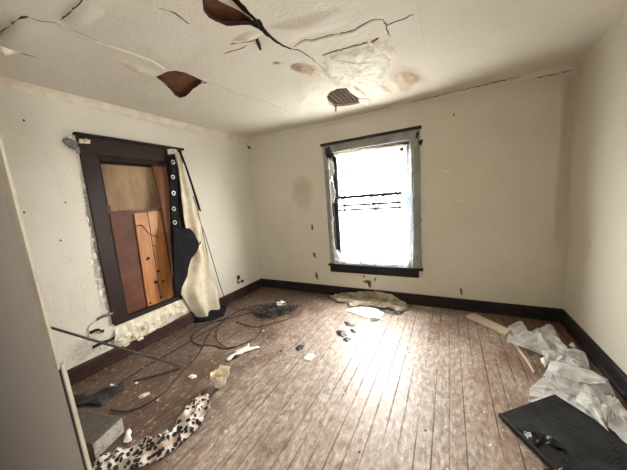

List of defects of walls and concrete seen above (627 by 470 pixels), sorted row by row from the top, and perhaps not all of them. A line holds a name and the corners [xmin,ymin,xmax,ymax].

peeling [0,45,20,56]
spalling [157,71,207,98]
peeling [202,0,263,54]
crack [253,0,427,75]
flaking render [319,37,399,106]
peeling [82,183,107,304]
flaking render [72,300,188,365]